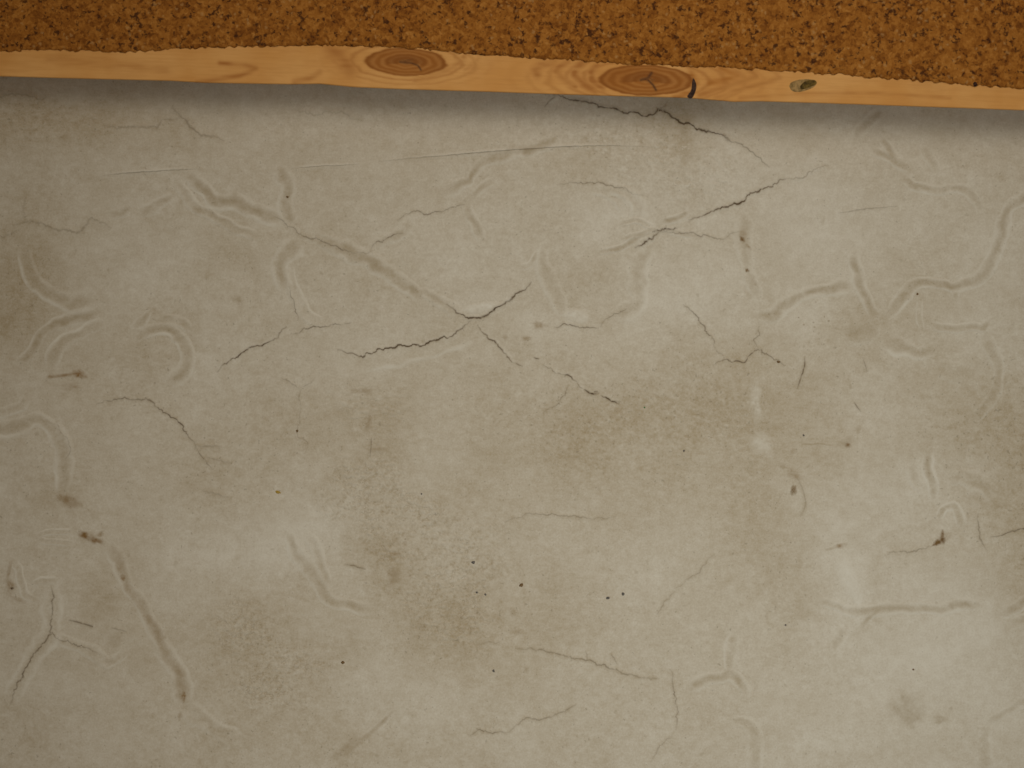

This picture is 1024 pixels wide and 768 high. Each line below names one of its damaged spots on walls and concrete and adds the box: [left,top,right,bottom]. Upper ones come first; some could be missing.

crack [294,105,364,125]
crack [541,94,828,251]
crack [273,202,465,257]
crack [215,280,628,416]
crack [681,303,787,368]
crack [96,394,222,471]
crack [8,586,98,705]